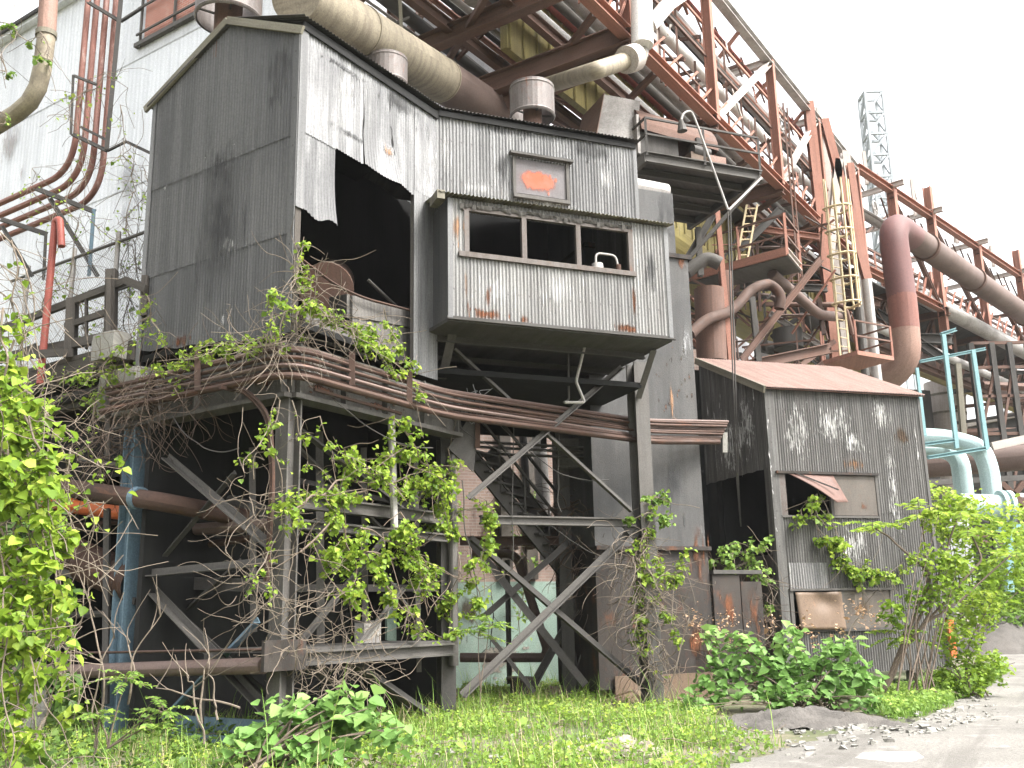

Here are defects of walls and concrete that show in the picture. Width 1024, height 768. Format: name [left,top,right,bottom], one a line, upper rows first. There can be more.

corrosion [466,279,532,323]
peeling [784,401,866,460]
peeling [872,401,891,431]
peeling [885,449,902,549]